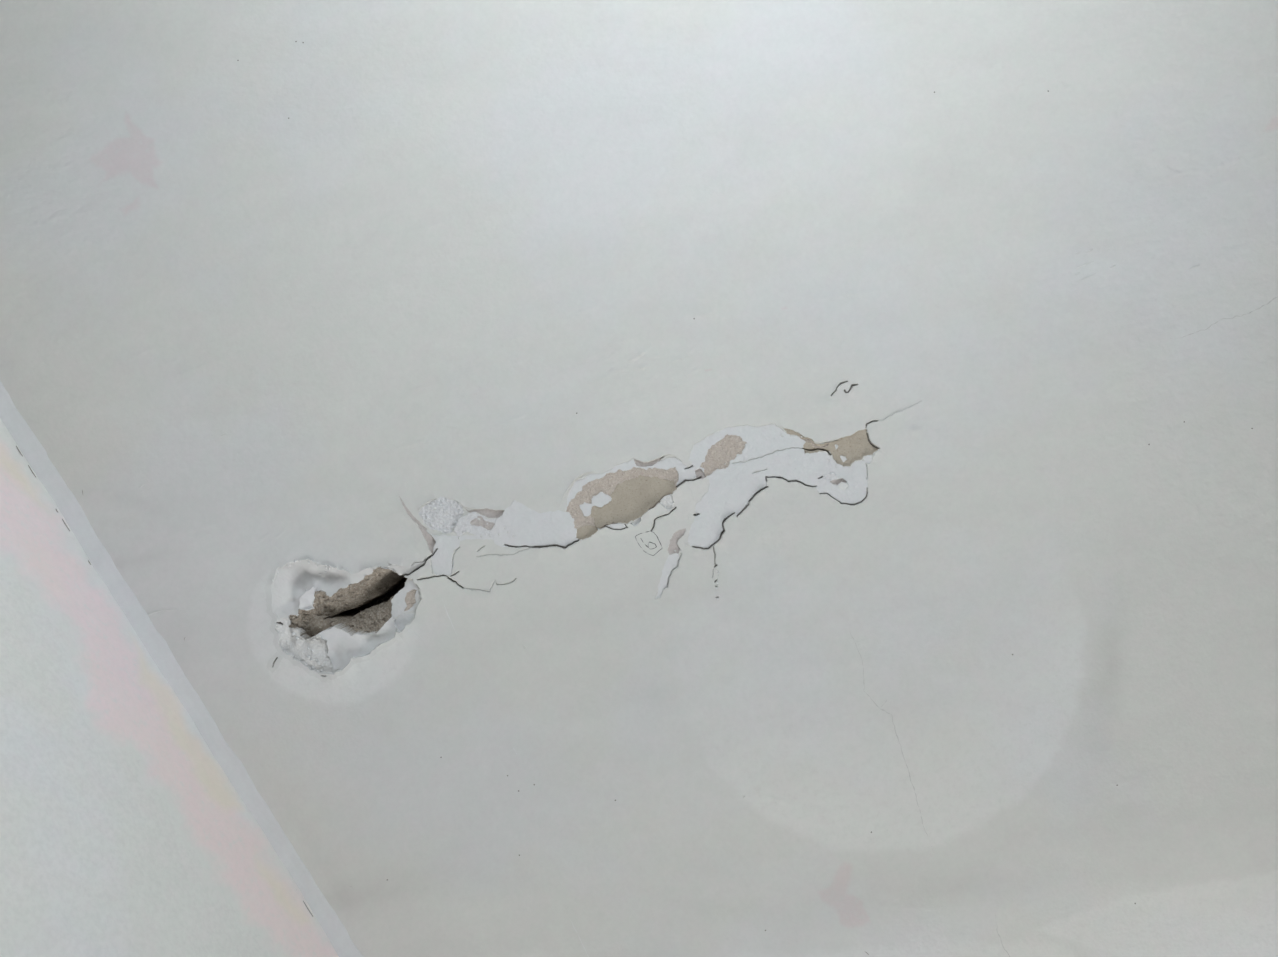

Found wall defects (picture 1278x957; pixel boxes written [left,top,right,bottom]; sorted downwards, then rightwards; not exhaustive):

peeling [276,567,419,674]
crack [389,496,514,592]
peeling [419,401,921,599]
crack [712,546,720,600]